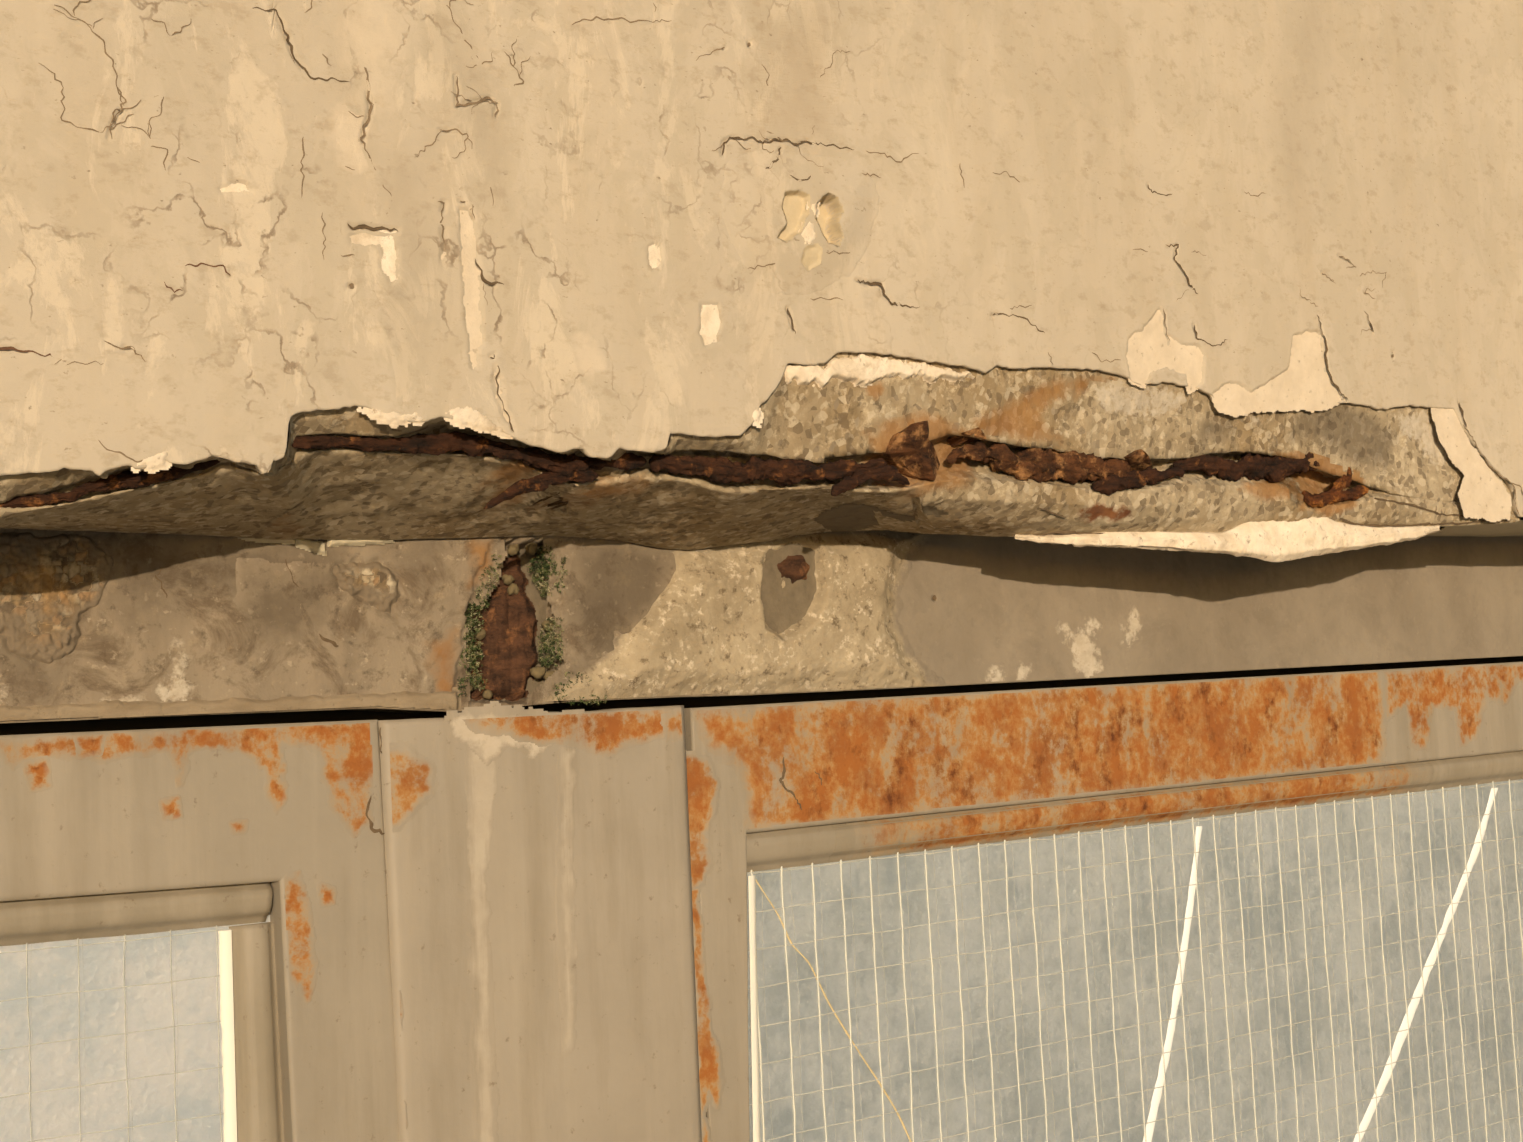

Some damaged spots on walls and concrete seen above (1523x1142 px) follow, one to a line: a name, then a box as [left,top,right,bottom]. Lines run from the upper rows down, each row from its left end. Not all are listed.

crack [39,0,200,170]
crack [252,0,398,258]
peeling [350,228,398,282]
peeling [441,210,482,369]
crack [417,0,530,158]
peeling [798,202,820,244]
crack [712,128,919,181]
crack [787,250,919,334]
corrosion [0,459,220,508]
corrosion [0,723,440,838]
spalling [0,304,1520,1142]
corrosion [284,369,1523,1142]